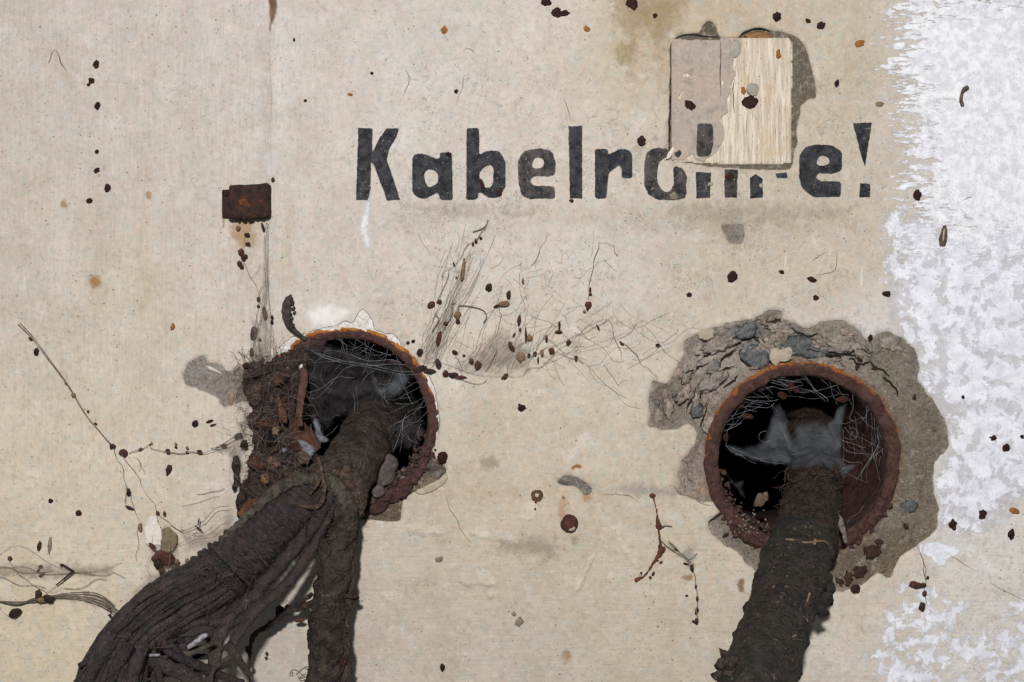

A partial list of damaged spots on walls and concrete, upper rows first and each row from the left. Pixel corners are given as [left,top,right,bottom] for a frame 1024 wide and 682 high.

spalling [668,21,816,170]
corrosion [223,218,255,246]
corrosion [296,364,308,426]
spalling [648,205,1024,592]